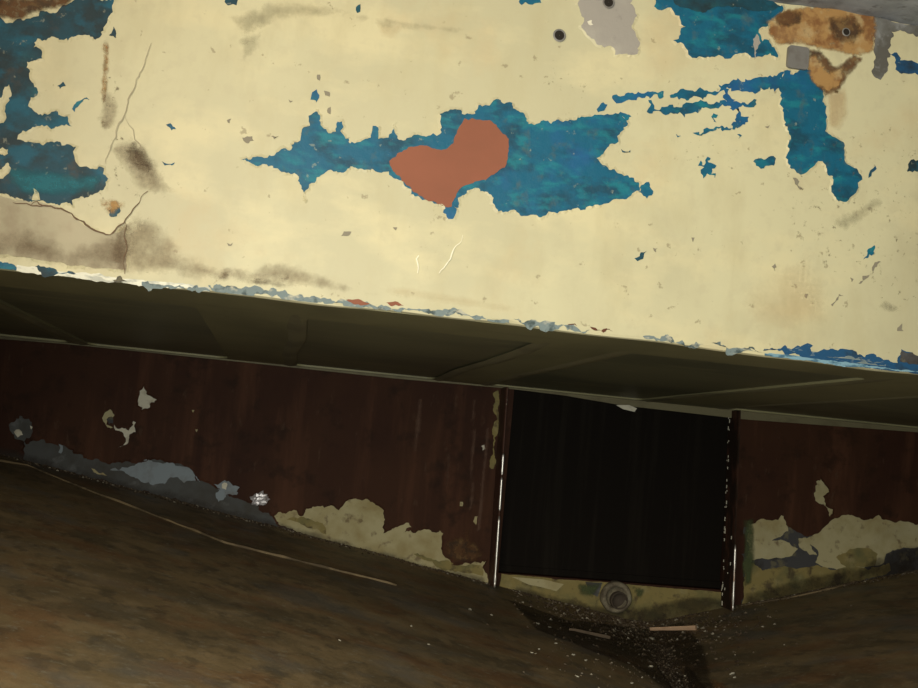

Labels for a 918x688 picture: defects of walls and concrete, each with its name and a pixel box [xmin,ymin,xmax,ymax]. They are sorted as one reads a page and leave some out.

rust [769,7,876,93]
flaking render [872,18,918,80]
peeling [0,0,117,208]
crack [105,45,151,164]
peeling [239,0,877,222]
water stain [129,145,149,167]
crack [13,191,148,274]
peeling [0,261,611,333]
peeling [714,342,918,374]
peeling [9,416,488,583]
peeling [741,476,918,604]
peeling [500,574,608,611]